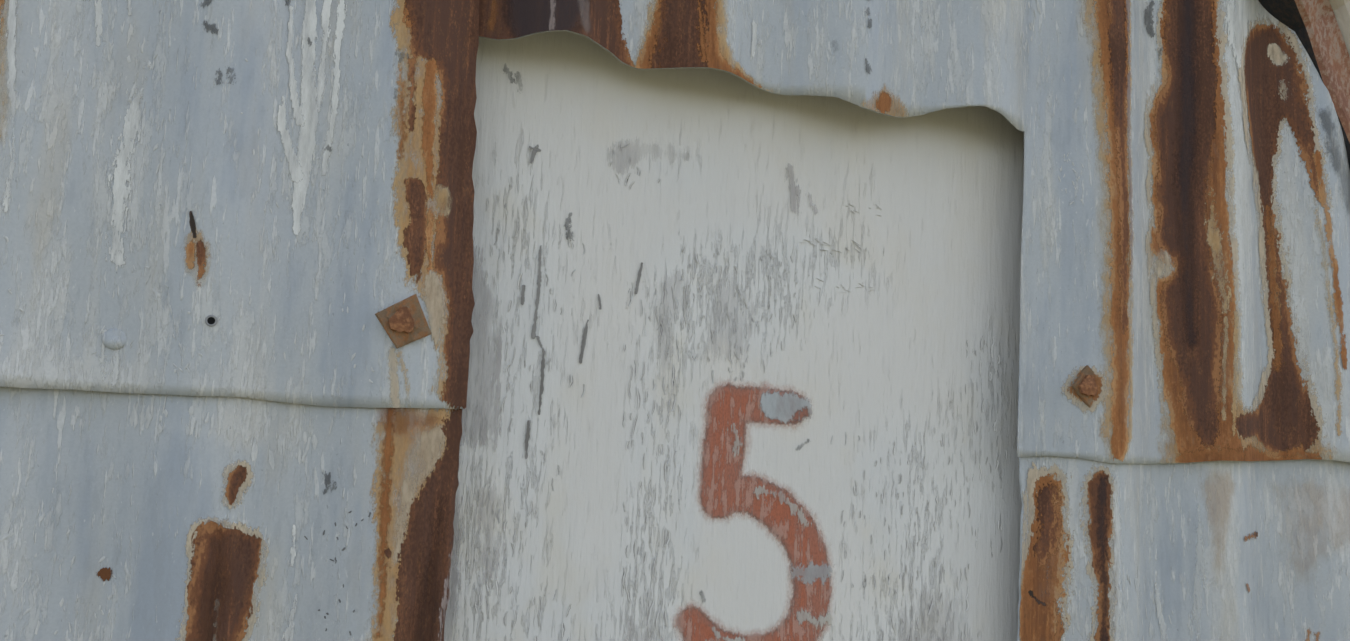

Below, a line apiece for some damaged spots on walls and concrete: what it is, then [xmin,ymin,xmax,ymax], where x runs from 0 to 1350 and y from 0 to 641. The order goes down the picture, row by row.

rust [185,211,210,286]
rust [370,0,769,641]
peeling [622,248,797,489]
rust [1019,0,1348,641]
rust [175,460,269,641]
peeling [622,502,670,639]
peeling [787,498,812,526]
peeling [841,399,1007,596]